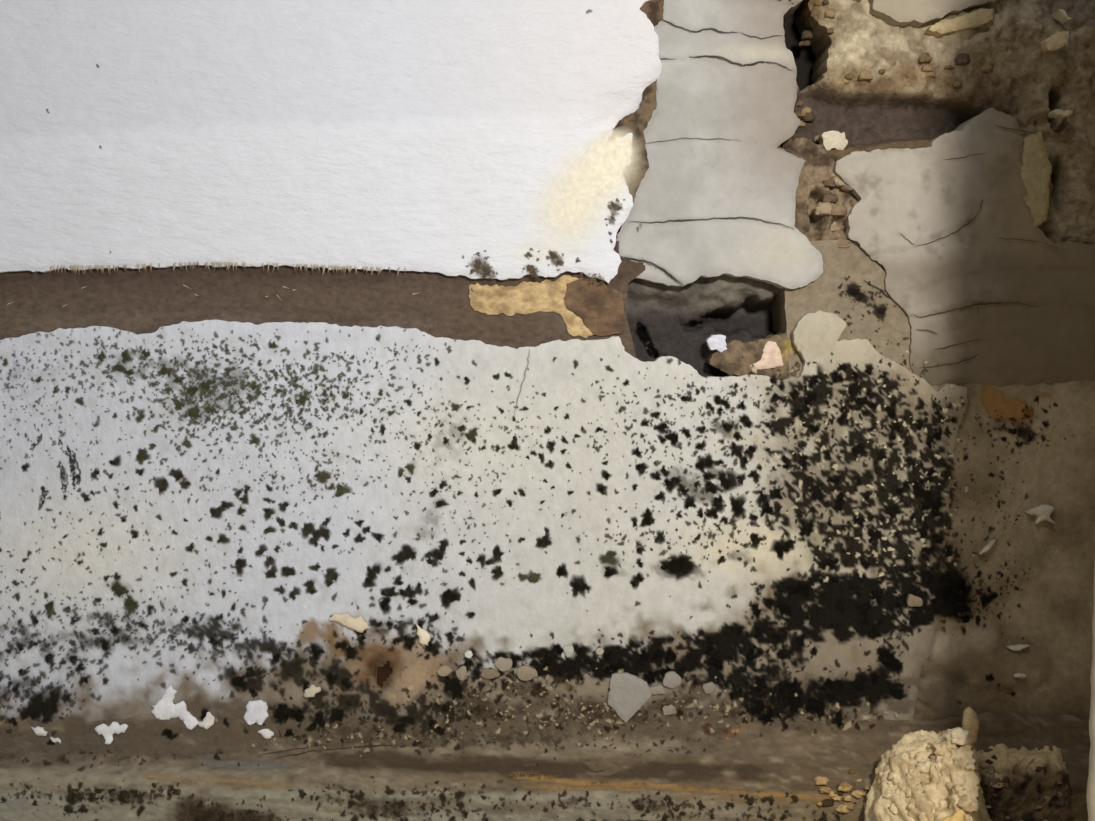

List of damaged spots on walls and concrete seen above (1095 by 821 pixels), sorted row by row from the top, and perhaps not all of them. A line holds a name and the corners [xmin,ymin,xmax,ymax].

peeling [0,0,1095,387]
water stain [0,276,1073,821]